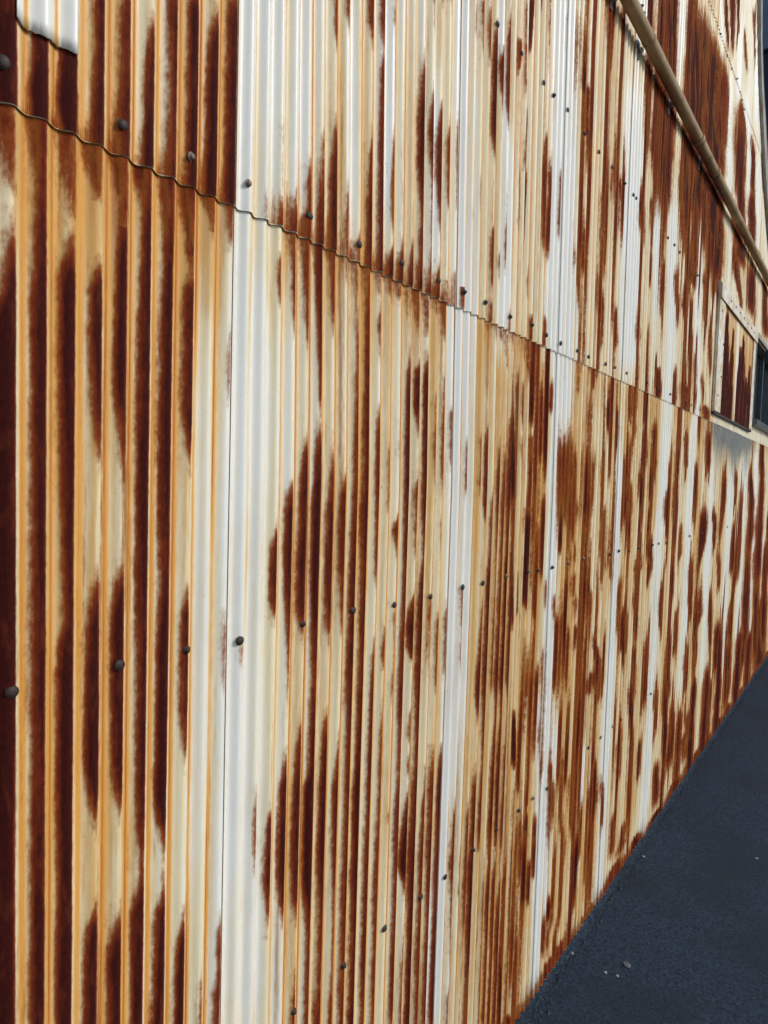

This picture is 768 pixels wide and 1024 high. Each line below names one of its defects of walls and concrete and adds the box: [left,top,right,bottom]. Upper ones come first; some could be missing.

corrosion [0,0,238,1024]
corrosion [252,0,768,1024]